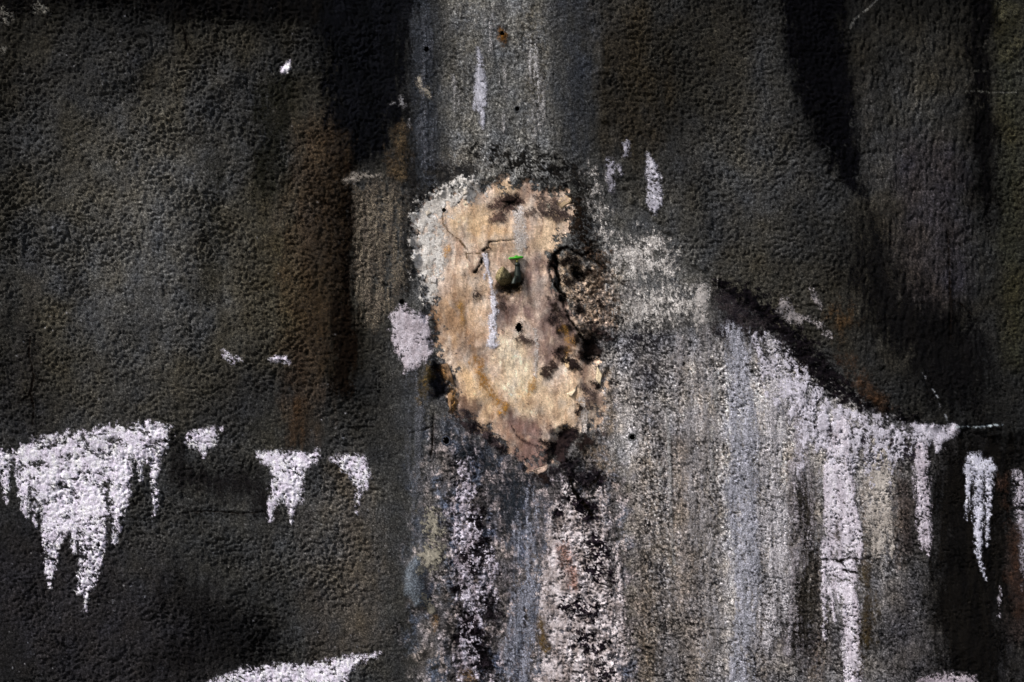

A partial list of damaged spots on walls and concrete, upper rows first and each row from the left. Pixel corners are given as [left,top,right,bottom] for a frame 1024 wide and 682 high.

damp [781,0,869,201]
damp [0,0,486,576]
crack [442,213,511,297]
spalling [408,173,609,475]
damp [445,0,1024,682]
damp [0,420,370,611]